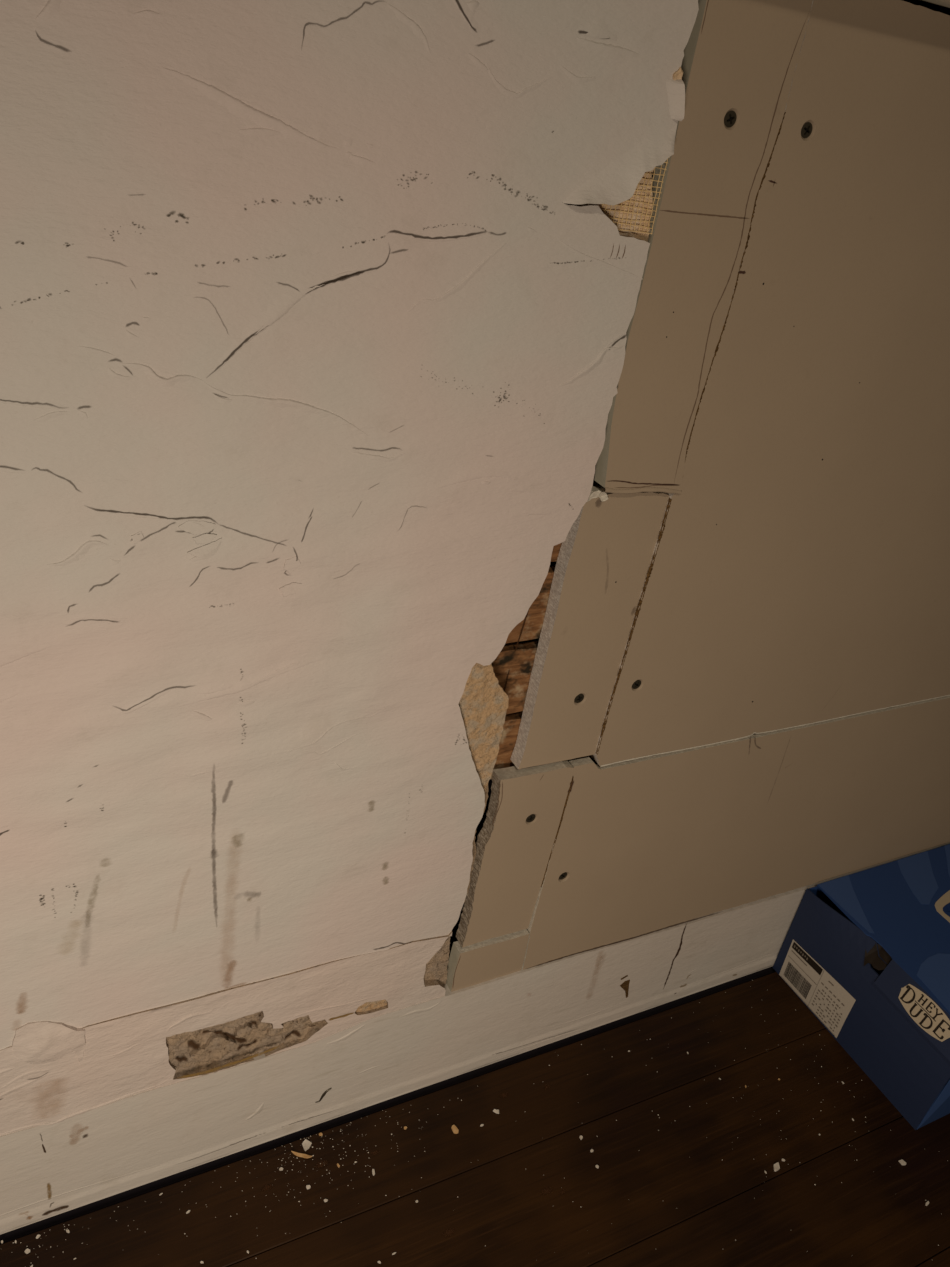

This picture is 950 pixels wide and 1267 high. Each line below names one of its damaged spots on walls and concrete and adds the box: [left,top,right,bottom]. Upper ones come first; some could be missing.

crack [452,0,479,35]
spalling [902,0,950,15]
flaking render [563,67,685,258]
crack [78,229,486,437]
crack [0,392,88,422]
crack [0,461,26,474]
crack [84,505,212,521]
flaking render [424,663,522,988]
crack [664,926,686,987]
flaking render [166,999,387,1078]